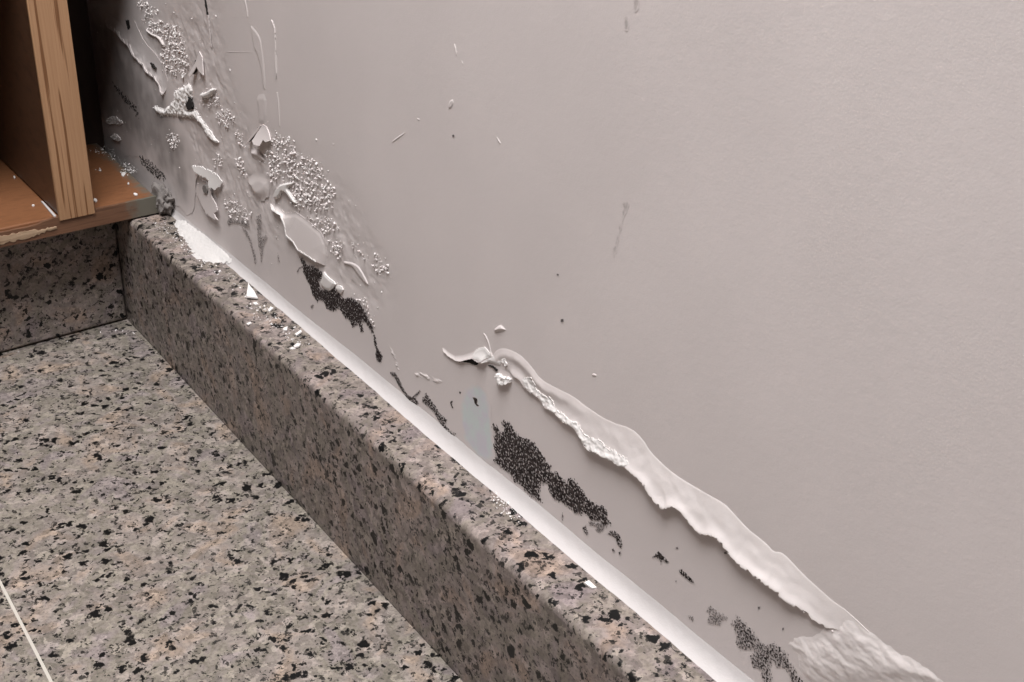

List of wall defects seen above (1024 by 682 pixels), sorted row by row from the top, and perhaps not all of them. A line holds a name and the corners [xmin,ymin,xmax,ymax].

peeling [105,12,167,95]
peeling [188,51,204,77]
peeling [245,124,271,146]
peeling [192,165,223,220]
peeling [270,204,328,266]
water stain [297,256,623,555]
peeling [442,333,870,633]
mould [707,606,804,682]